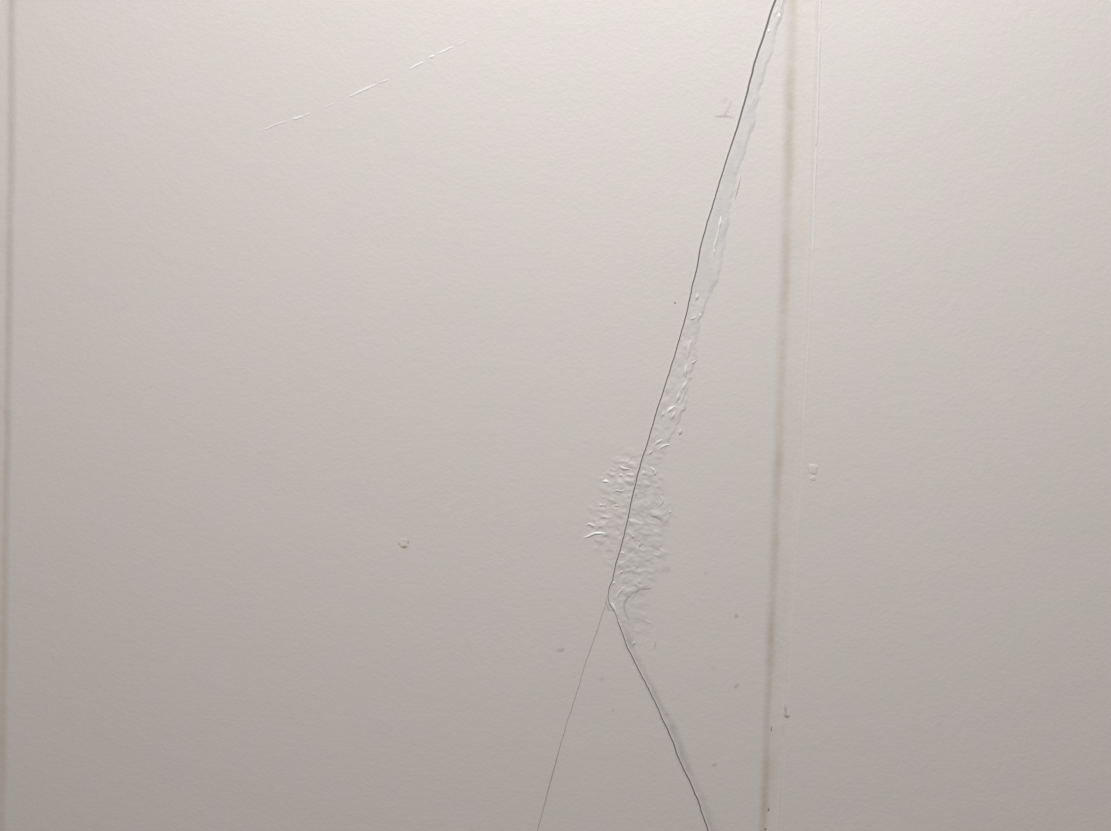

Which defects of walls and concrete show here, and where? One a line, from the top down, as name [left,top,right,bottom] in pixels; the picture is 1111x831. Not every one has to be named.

crack [537,0,777,831]